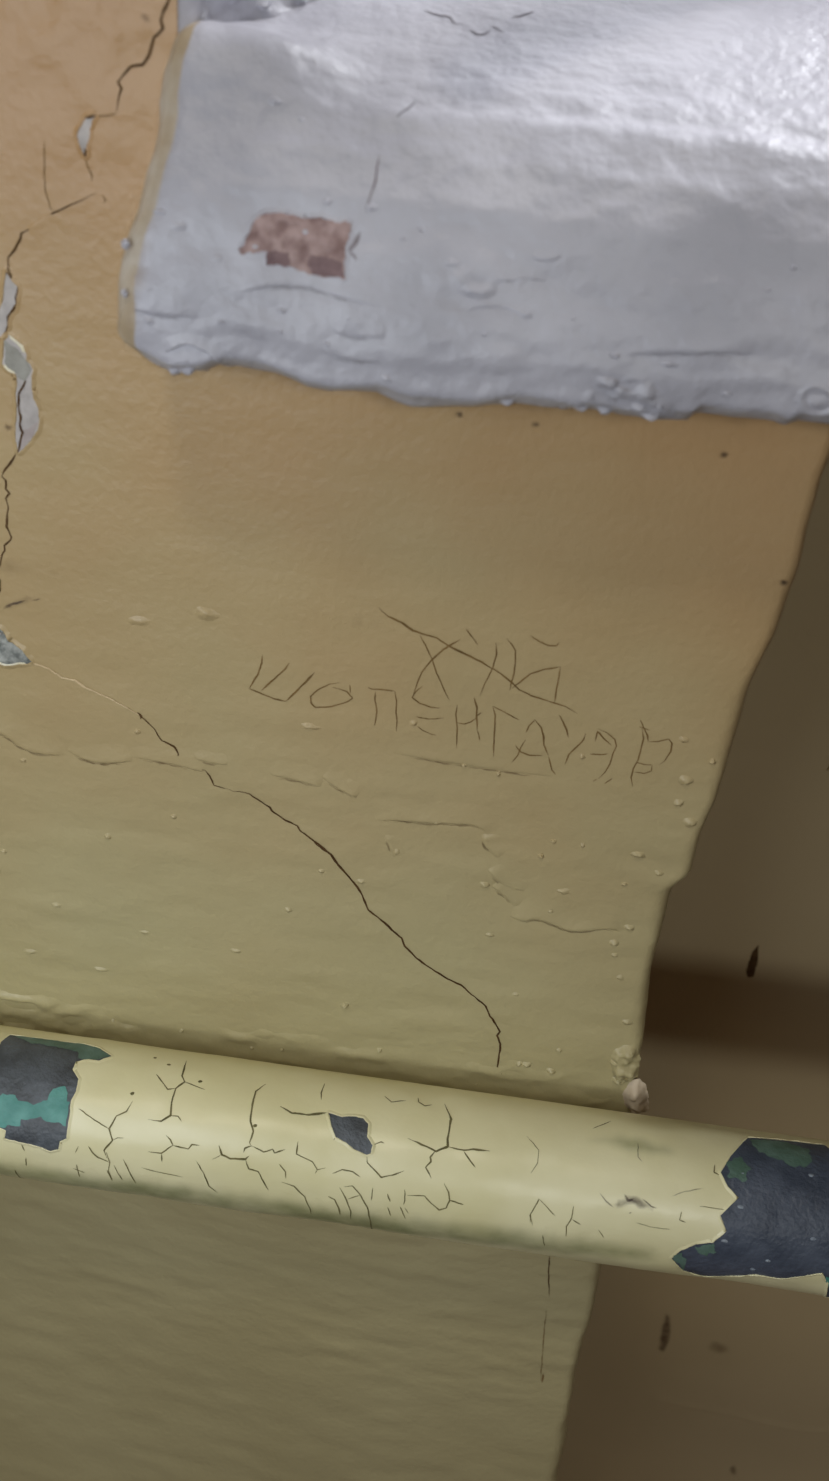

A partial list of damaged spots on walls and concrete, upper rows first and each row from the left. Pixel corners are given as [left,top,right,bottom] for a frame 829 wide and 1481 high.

crack [98,0,170,117]
crack [427,11,534,35]
spalling [73,110,100,181]
crack [7,141,106,268]
peeling [237,208,356,282]
crack [349,157,379,261]
peeling [0,265,44,456]
crack [0,454,16,591]
spalling [0,624,35,669]
crack [28,663,502,1074]